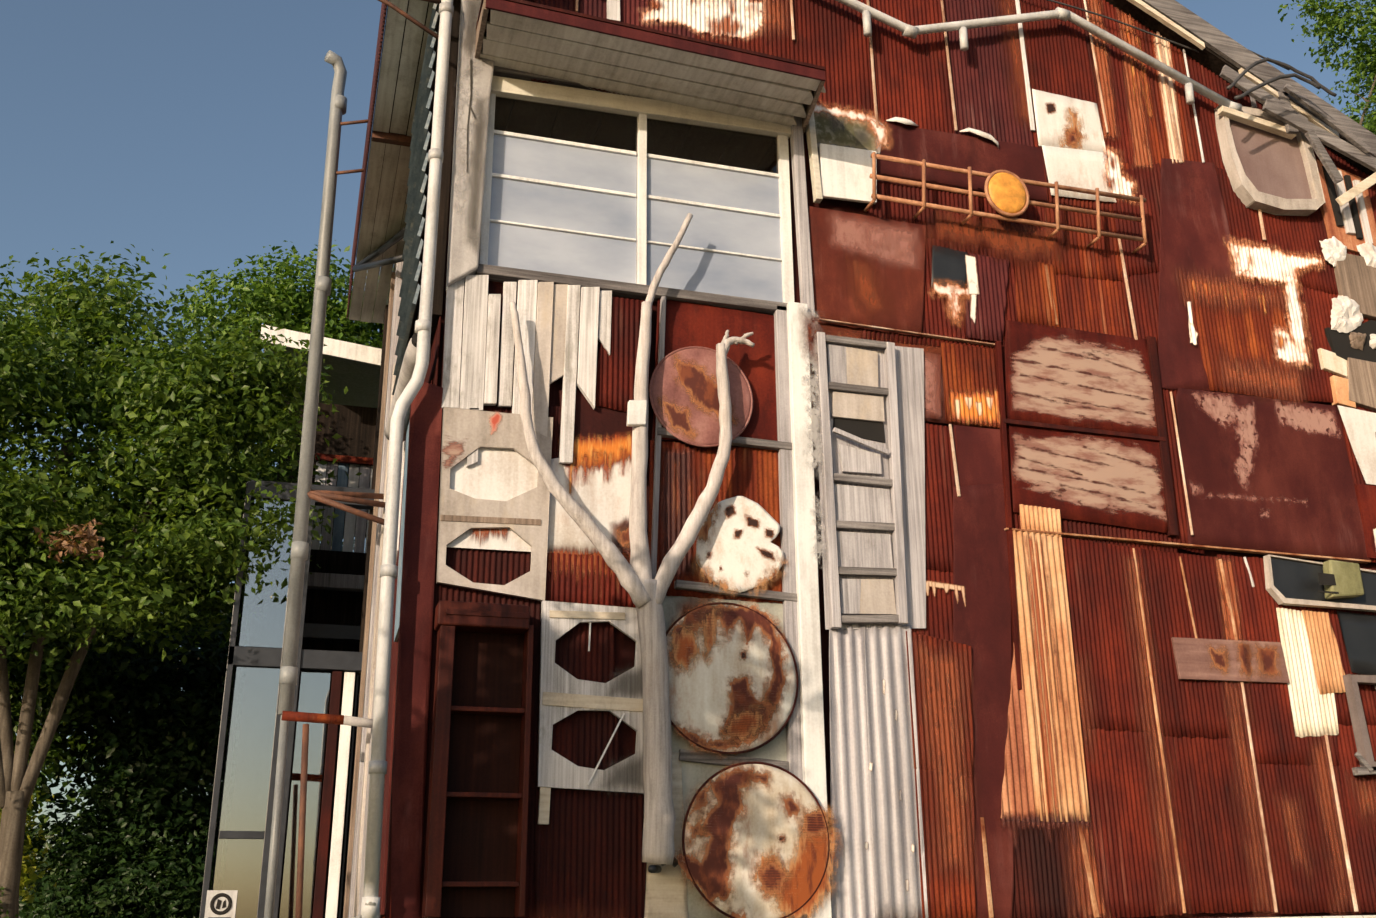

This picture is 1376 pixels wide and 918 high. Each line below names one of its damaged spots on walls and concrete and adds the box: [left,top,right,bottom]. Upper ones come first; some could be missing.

peeling [640,0,764,39]
peeling [933,255,979,323]
peeling [1226,236,1376,367]
rust [567,433,632,494]
rust [949,389,1000,425]
peeling [1010,335,1167,521]
rust [659,356,787,918]
rust [912,640,972,879]
rust [1002,537,1105,918]
rust [753,795,840,918]